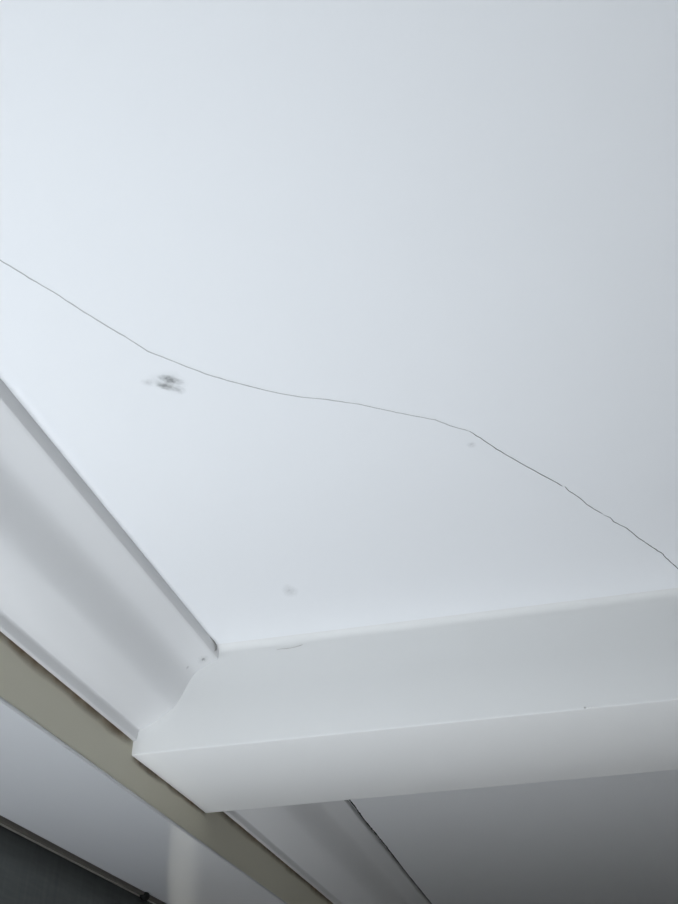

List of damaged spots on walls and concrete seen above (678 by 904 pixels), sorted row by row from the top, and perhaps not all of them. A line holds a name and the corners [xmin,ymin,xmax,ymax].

crack [0,260,678,569]